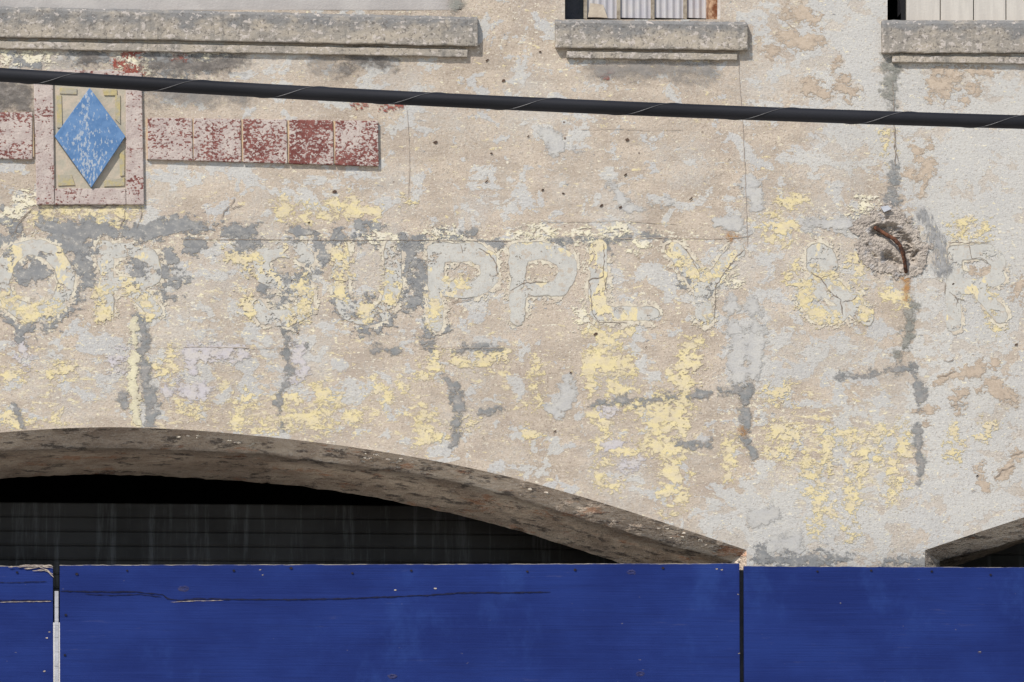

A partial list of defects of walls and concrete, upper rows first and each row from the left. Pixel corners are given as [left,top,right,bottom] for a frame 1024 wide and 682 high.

peeling [758,0,828,61]
peeling [799,51,864,108]
water stain [878,52,902,111]
peeling [922,63,1001,107]
peeling [875,128,941,199]
water stain [893,299,920,361]
peeling [0,173,1024,567]